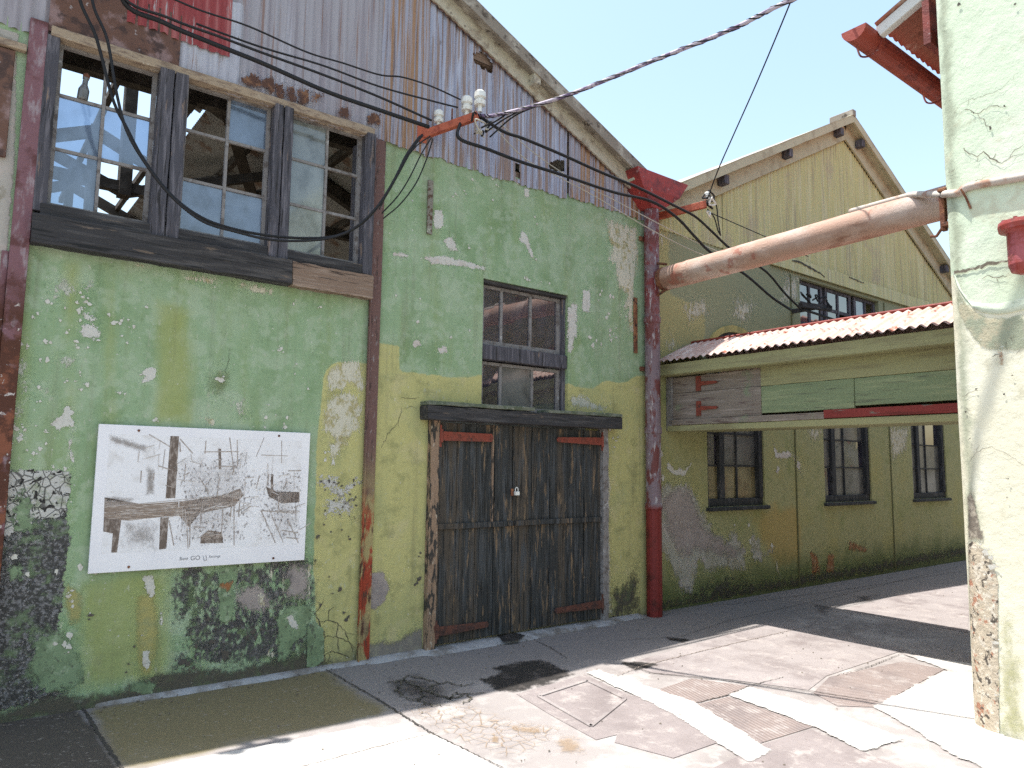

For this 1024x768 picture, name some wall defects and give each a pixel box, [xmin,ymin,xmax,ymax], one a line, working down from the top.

rust [241,73,324,105]
rust [366,113,381,125]
crack [954,73,1018,126]
peeling [421,210,486,270]
peeling [567,218,639,353]
peeling [316,360,366,540]
peeling [661,451,779,597]
damp [0,469,97,711]
damp [171,556,316,669]
crack [312,602,354,663]
flaking render [968,541,1000,733]